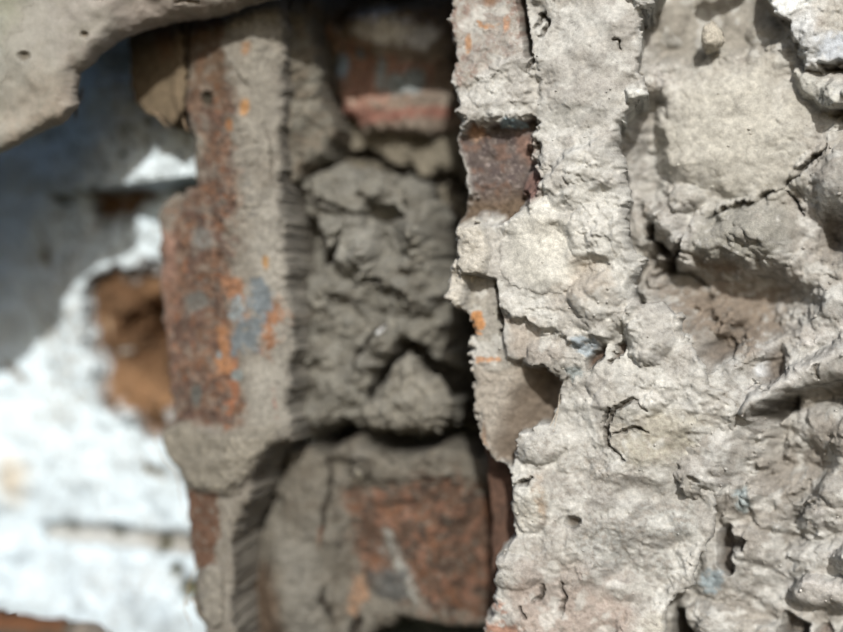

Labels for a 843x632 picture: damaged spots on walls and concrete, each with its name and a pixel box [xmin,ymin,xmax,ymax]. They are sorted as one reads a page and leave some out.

rust [325,23,457,134]
crack [516,0,554,73]
spalling [85,179,198,233]
rust [159,16,254,432]
crack [347,134,469,203]
crack [645,223,694,275]
spalling [78,253,176,443]
peeling [0,447,39,513]
spalling [365,338,590,467]
crack [601,396,649,462]
rust [185,486,223,589]
rust [332,463,526,632]